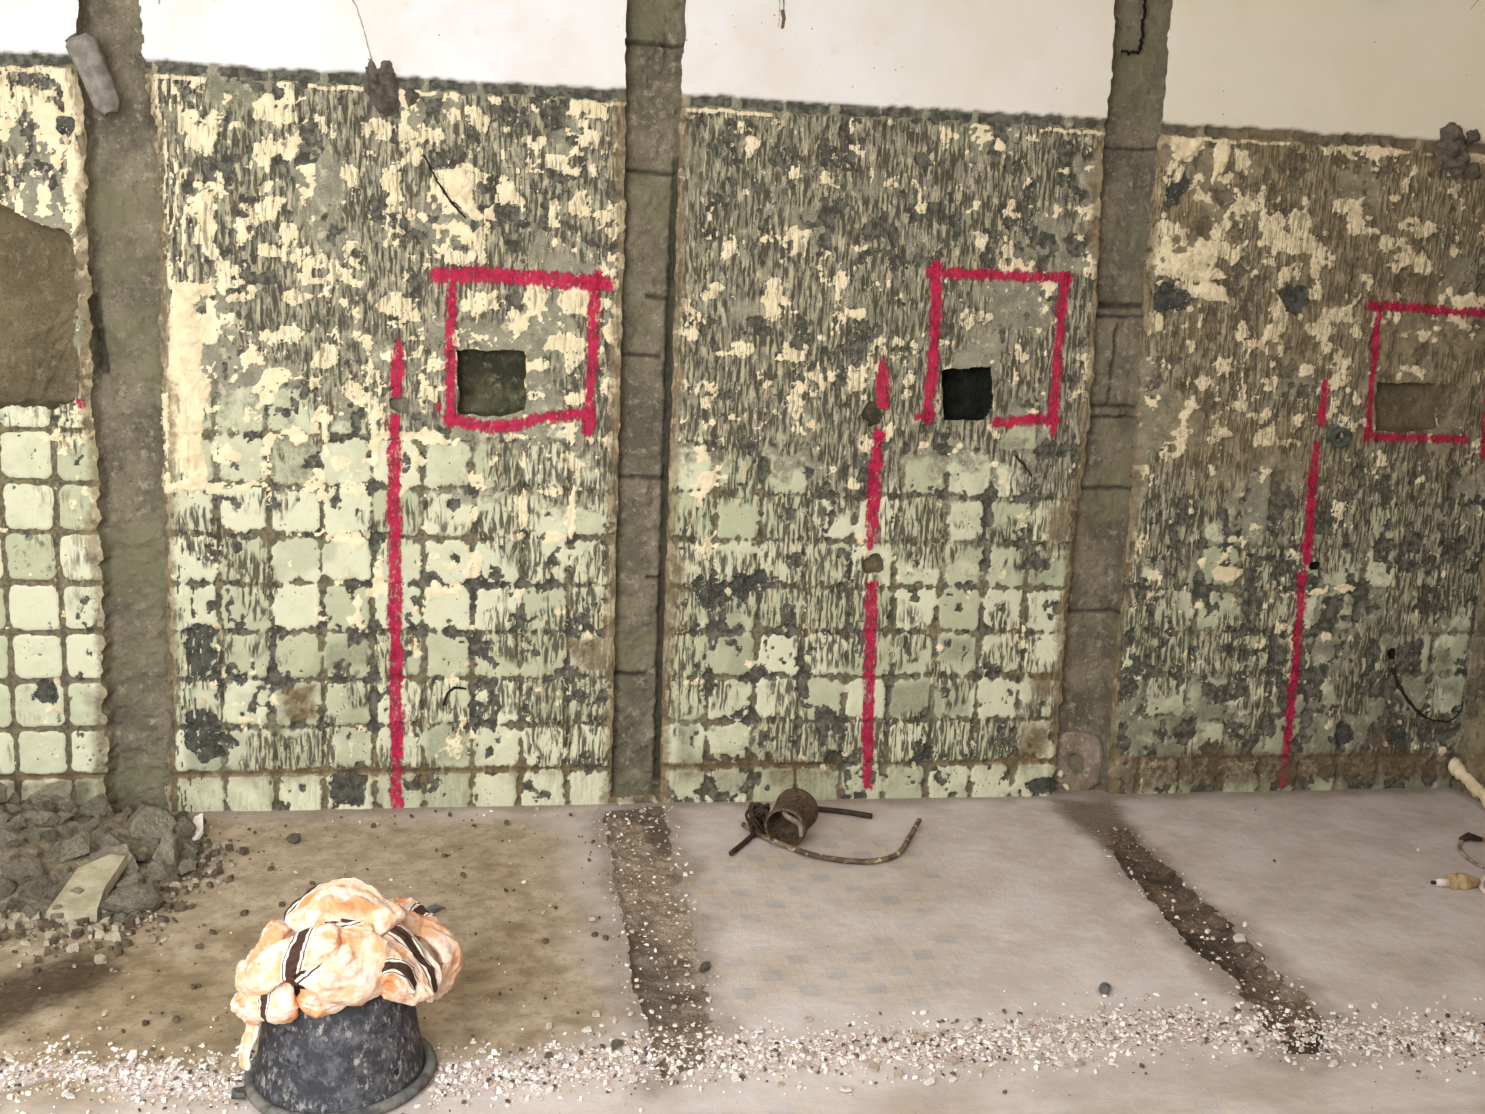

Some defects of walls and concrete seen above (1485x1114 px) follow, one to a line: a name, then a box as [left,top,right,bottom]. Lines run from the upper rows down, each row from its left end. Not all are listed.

crack [352,0,372,58]
crack [778,0,786,29]
crack [1121,0,1147,55]
peeling [442,166,517,221]
peeling [1161,138,1231,219]
peeling [1153,252,1230,314]
peeling [161,283,213,494]
spalling [691,564,773,609]
spalling [183,613,222,680]
spalling [183,698,225,764]
spalling [327,770,381,809]
spalling [1024,770,1069,797]